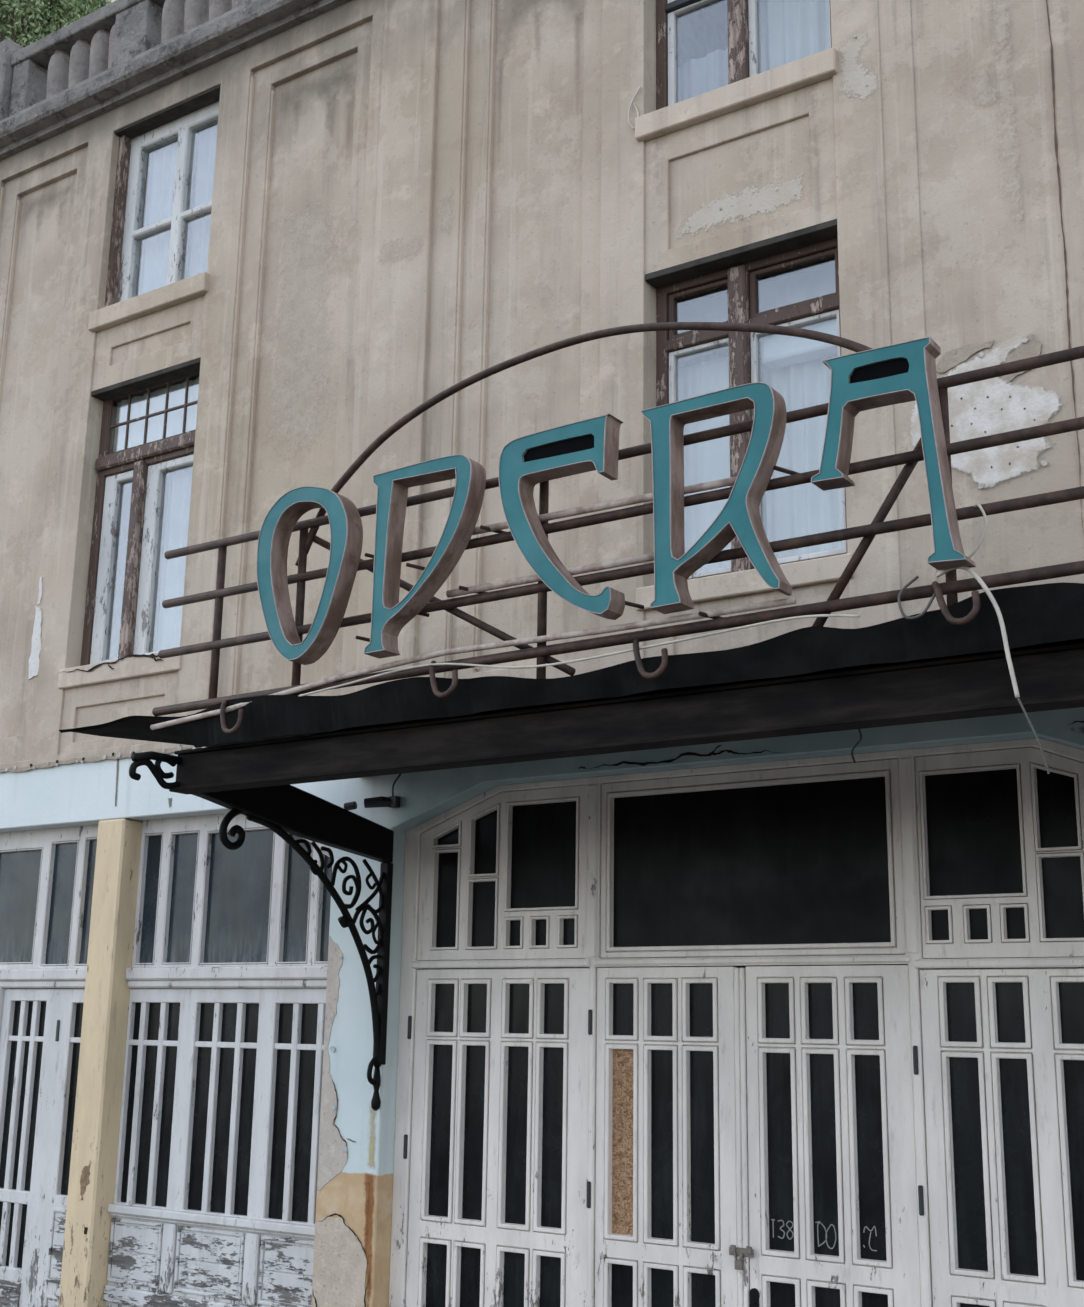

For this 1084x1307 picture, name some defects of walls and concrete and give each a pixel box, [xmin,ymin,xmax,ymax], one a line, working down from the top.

peeling [677,172,804,239]
peeling [909,401,921,448]
peeling [936,333,1061,489]
spalling [28,577,43,680]
crack [579,745,777,769]
peeling [317,936,348,1190]
peeling [311,1213,369,1307]